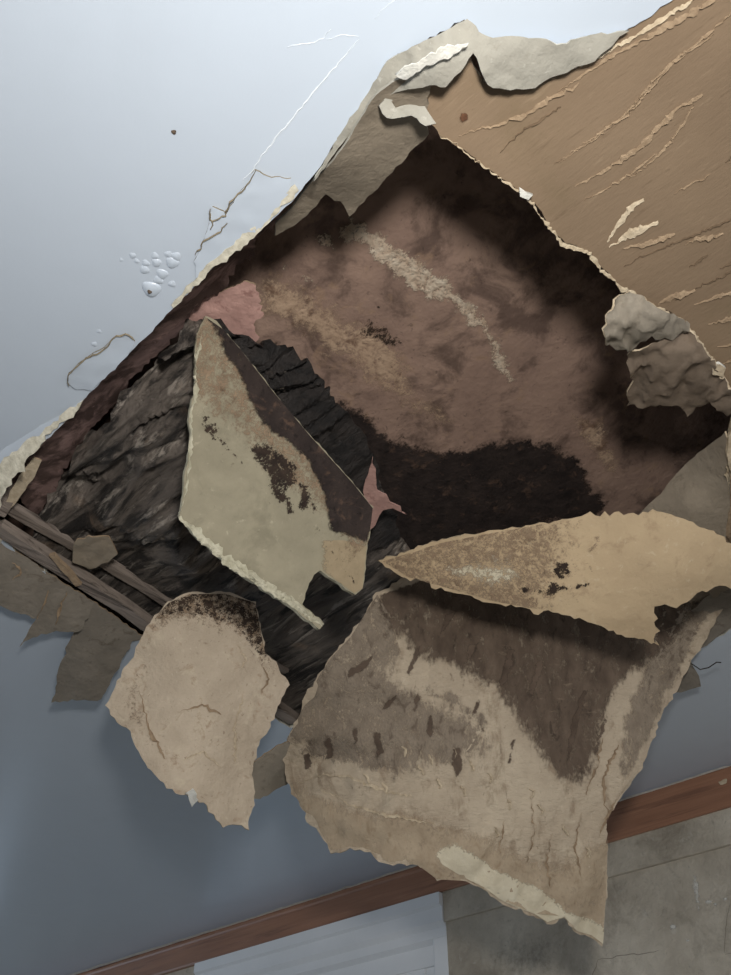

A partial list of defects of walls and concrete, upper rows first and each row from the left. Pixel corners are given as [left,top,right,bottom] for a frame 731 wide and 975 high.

crack [242,29,359,183]
peeling [171,19,629,308]
peeling [0,333,135,507]
damp [196,317,373,593]
damp [317,218,513,382]
spalling [712,362,726,377]
damp [153,594,269,663]
damp [287,401,708,782]
peeling [185,788,198,806]
damp [295,788,608,943]